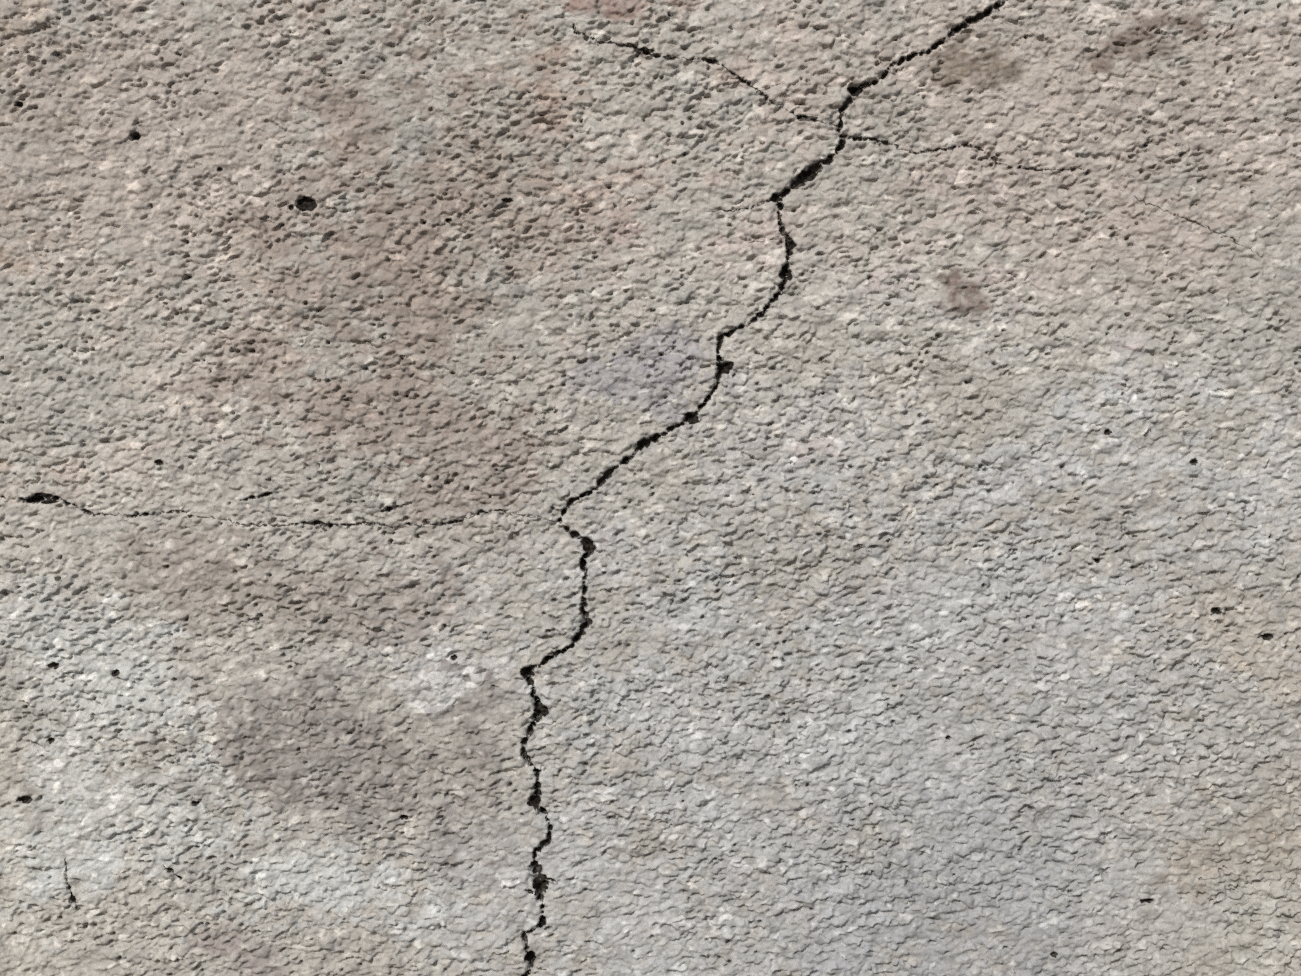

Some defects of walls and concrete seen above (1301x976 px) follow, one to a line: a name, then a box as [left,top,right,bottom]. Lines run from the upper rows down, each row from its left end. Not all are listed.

crack [15,492,120,517]
crack [126,0,1083,976]
crack [64,858,78,909]